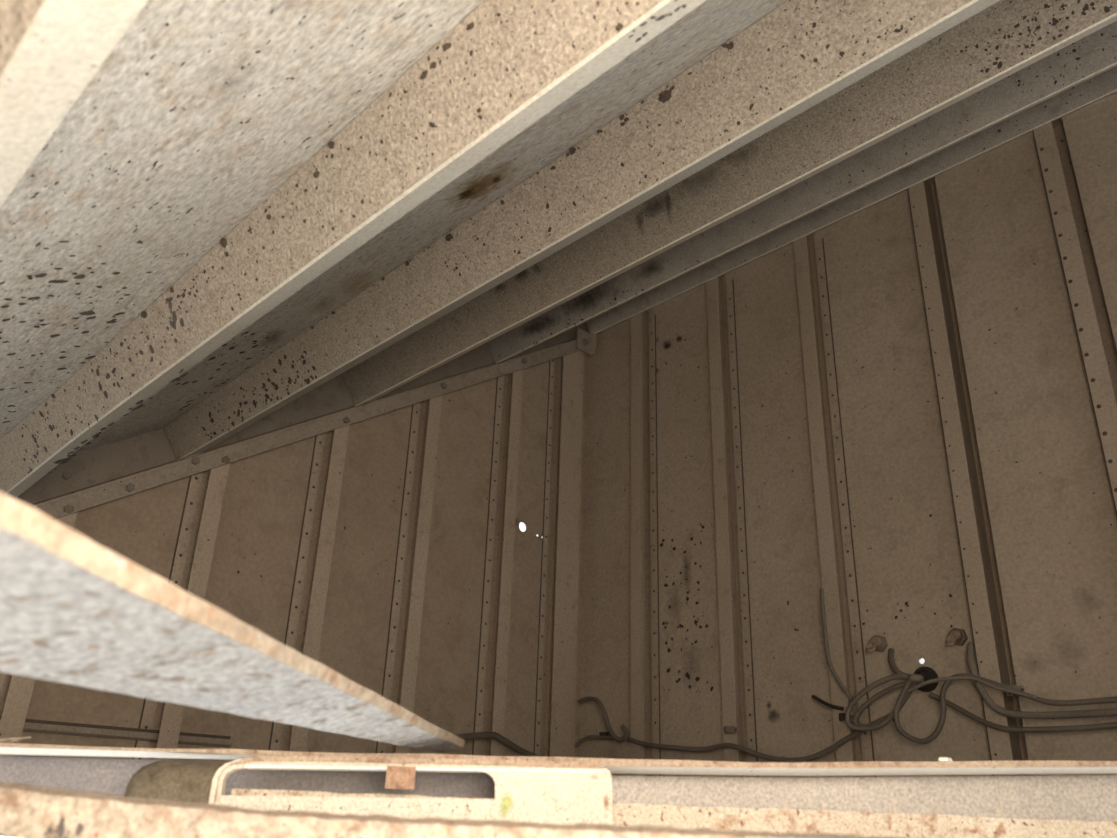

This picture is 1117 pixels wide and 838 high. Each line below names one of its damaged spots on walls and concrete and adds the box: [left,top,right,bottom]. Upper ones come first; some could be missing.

corrosion [461,173,502,199]
damp [660,524,713,695]